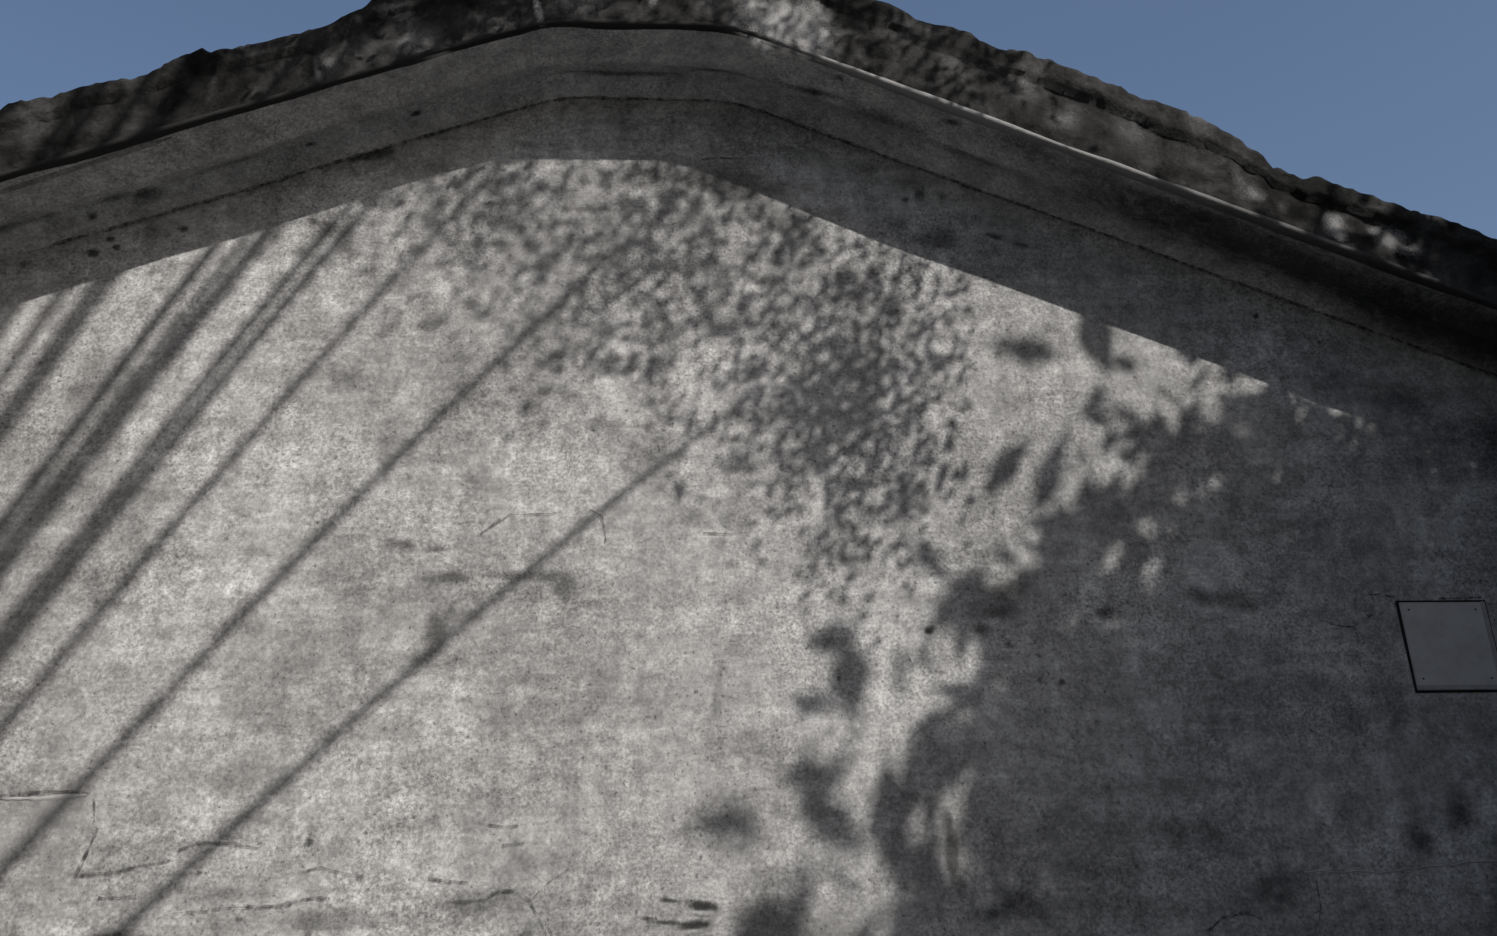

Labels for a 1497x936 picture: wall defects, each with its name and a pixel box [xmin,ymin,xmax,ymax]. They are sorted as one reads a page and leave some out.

crack [0,790,361,914]